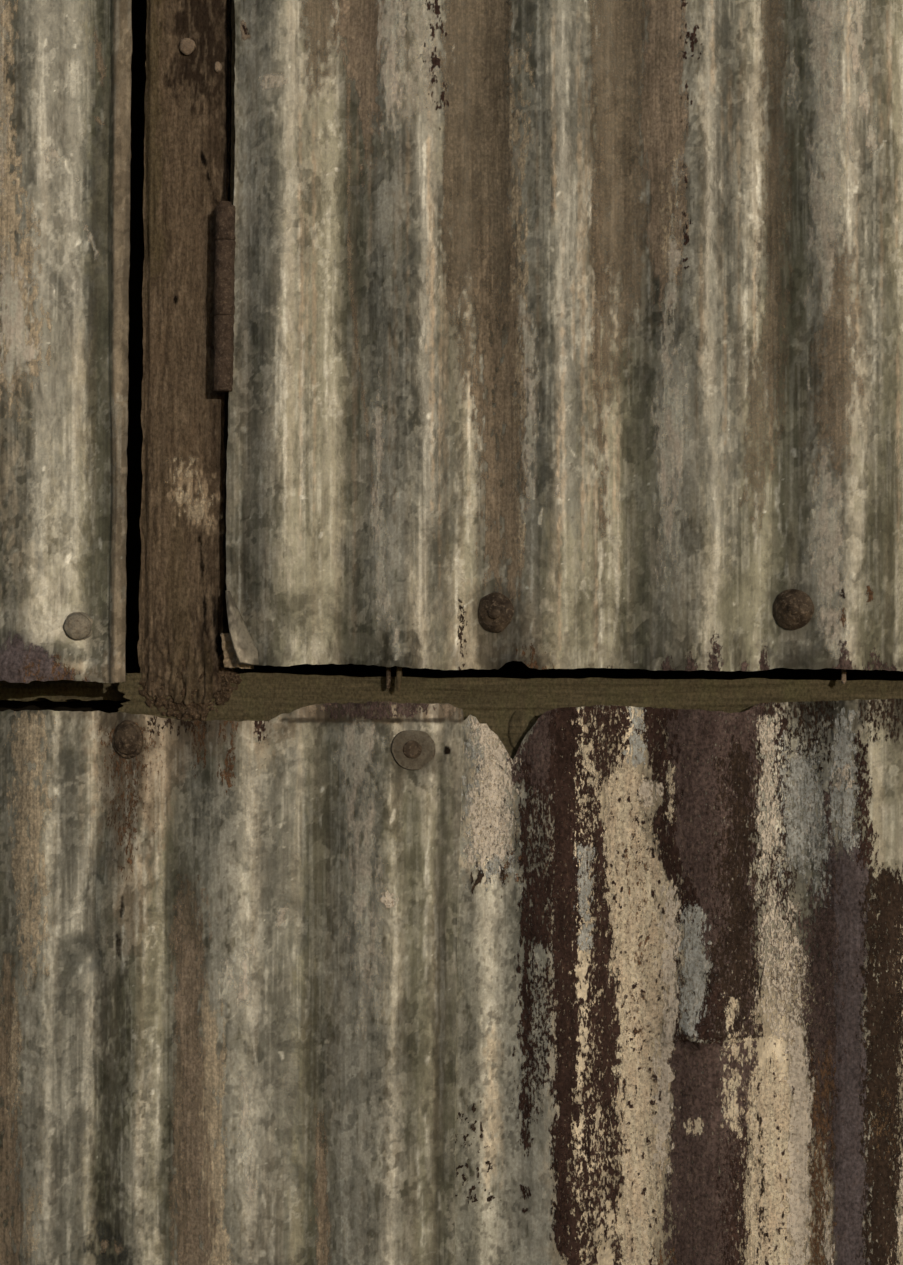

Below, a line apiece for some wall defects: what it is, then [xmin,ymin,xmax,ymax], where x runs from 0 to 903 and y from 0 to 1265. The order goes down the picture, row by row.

corrosion [99,716,238,880]
corrosion [254,721,269,744]
peeling [571,706,713,1265]
corrosion [470,699,903,1265]
peeling [720,707,864,1265]
corrosion [455,1097,501,1204]
peeling [887,1137,903,1265]